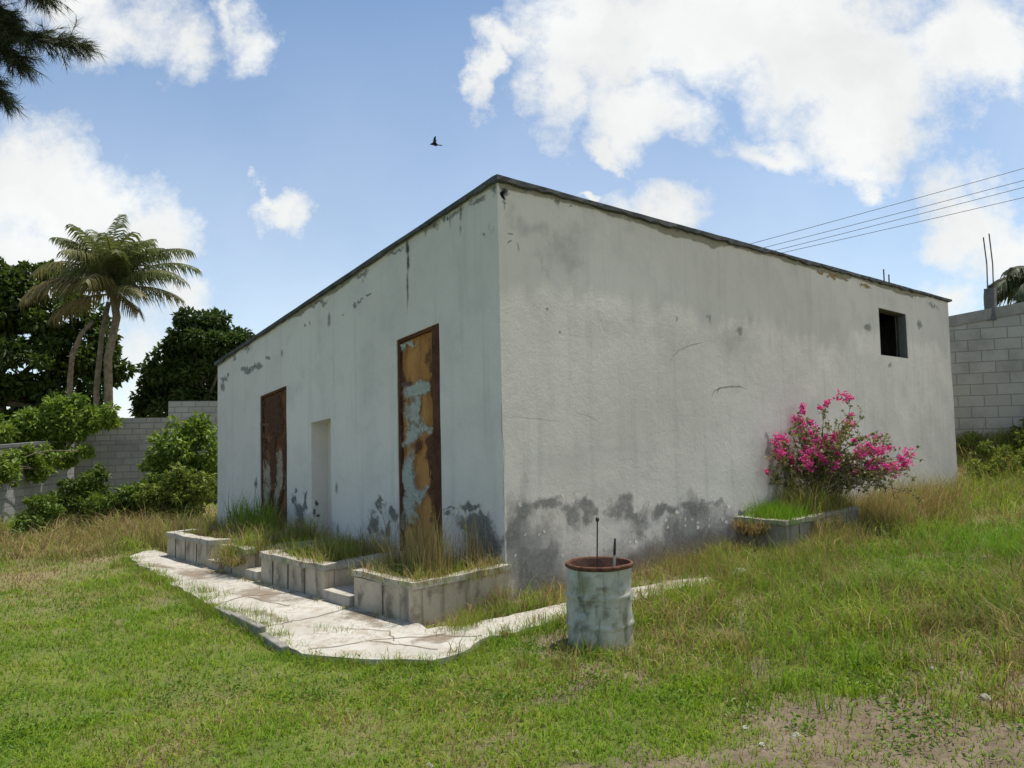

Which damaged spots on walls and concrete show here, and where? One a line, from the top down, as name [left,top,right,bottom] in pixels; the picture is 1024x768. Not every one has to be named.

peeling [218,216,444,390]
corrosion [263,395,285,512]
water stain [291,488,320,529]
water stain [367,496,405,535]
peeling [402,380,433,524]
corrosion [402,433,435,523]
water stain [445,491,735,600]